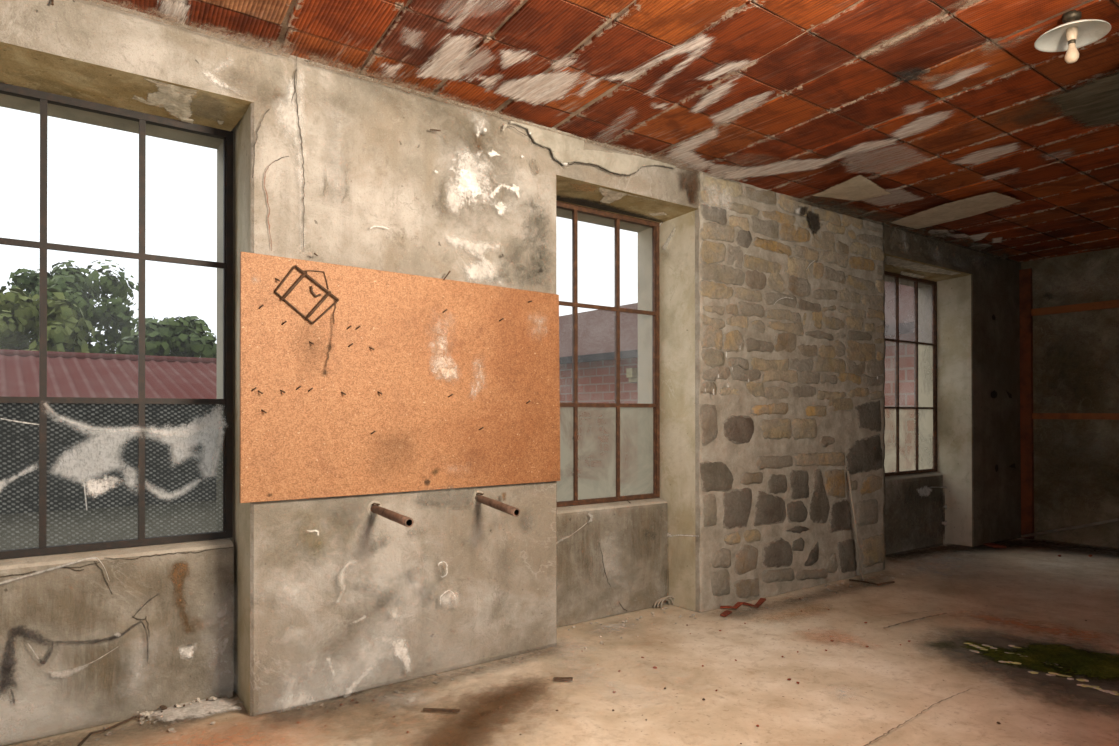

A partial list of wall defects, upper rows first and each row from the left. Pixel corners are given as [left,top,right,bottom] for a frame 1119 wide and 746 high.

peeling [132,78,198,124]
crack [252,57,336,251]
rust [171,563,191,632]
water stain [931,631,1119,709]
crack [864,690,968,746]